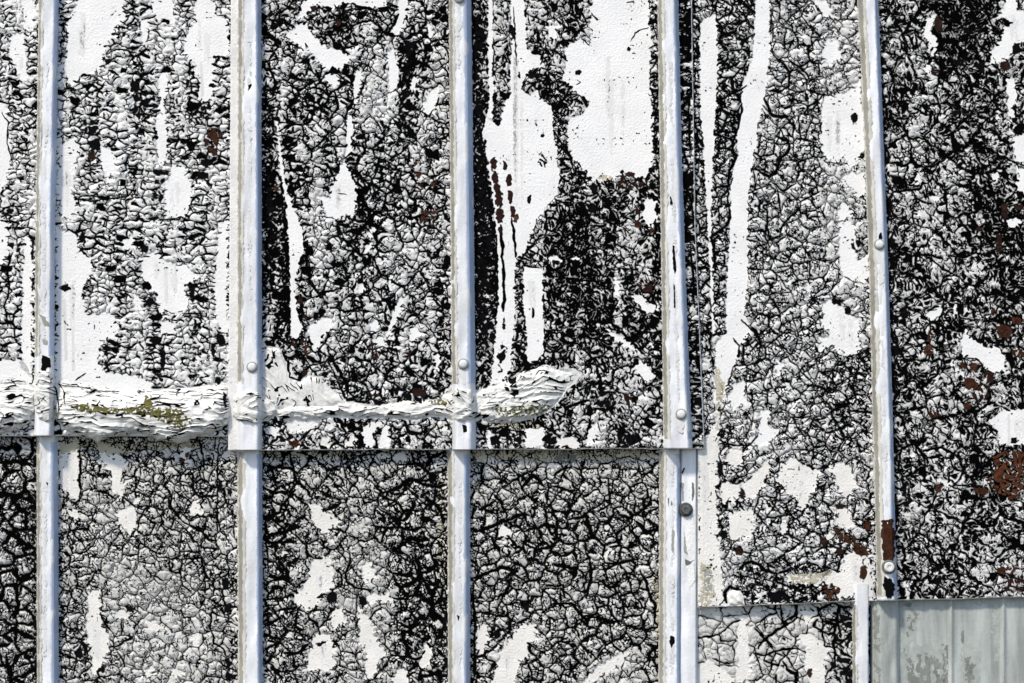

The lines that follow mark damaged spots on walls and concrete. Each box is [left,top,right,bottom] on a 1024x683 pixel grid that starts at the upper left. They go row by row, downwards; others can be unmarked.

peeling [263,0,387,88]
peeling [922,0,1024,72]
peeling [562,0,654,214]
peeling [0,0,200,390]
rust [490,158,519,234]
crack [0,0,663,683]
crack [678,0,1024,683]
rust [924,330,933,356]
rust [958,362,994,410]
peeling [668,365,861,606]
rust [974,450,1024,500]
rust [820,519,896,579]